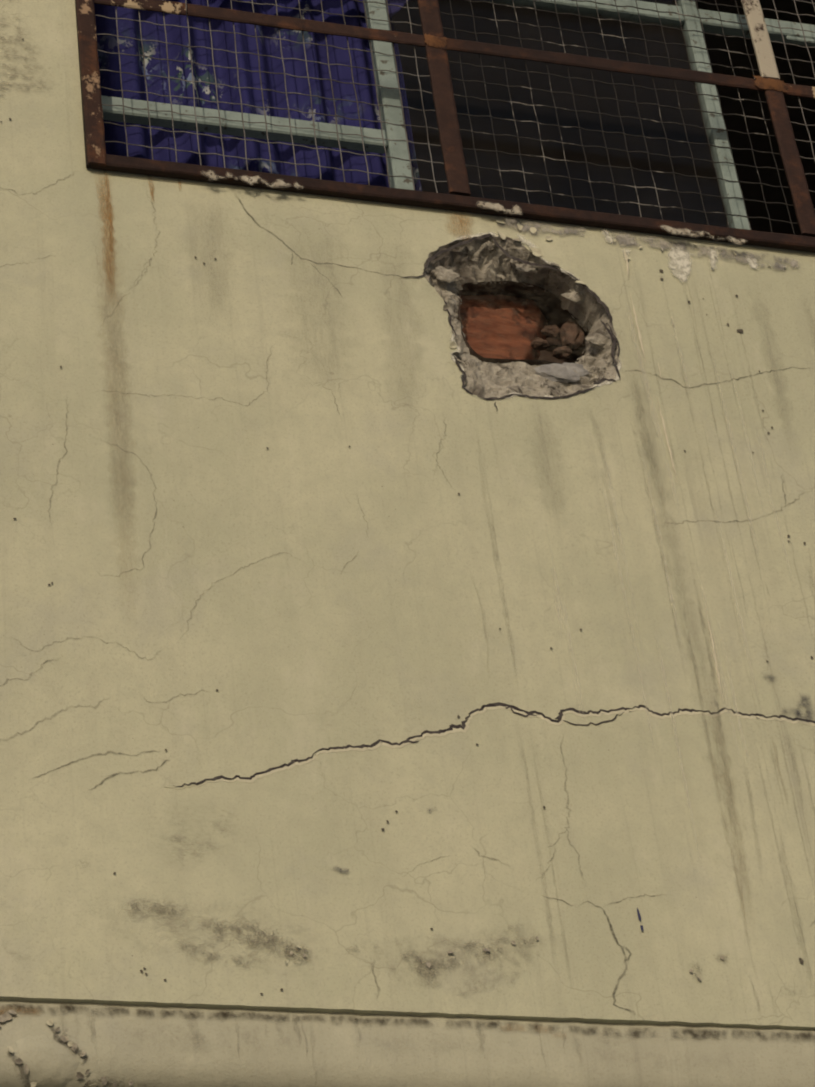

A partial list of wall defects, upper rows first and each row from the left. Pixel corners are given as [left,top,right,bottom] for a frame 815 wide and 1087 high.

spalling [402,201,621,412]
crack [149,702,815,790]
flaking render [7,1019,135,1087]